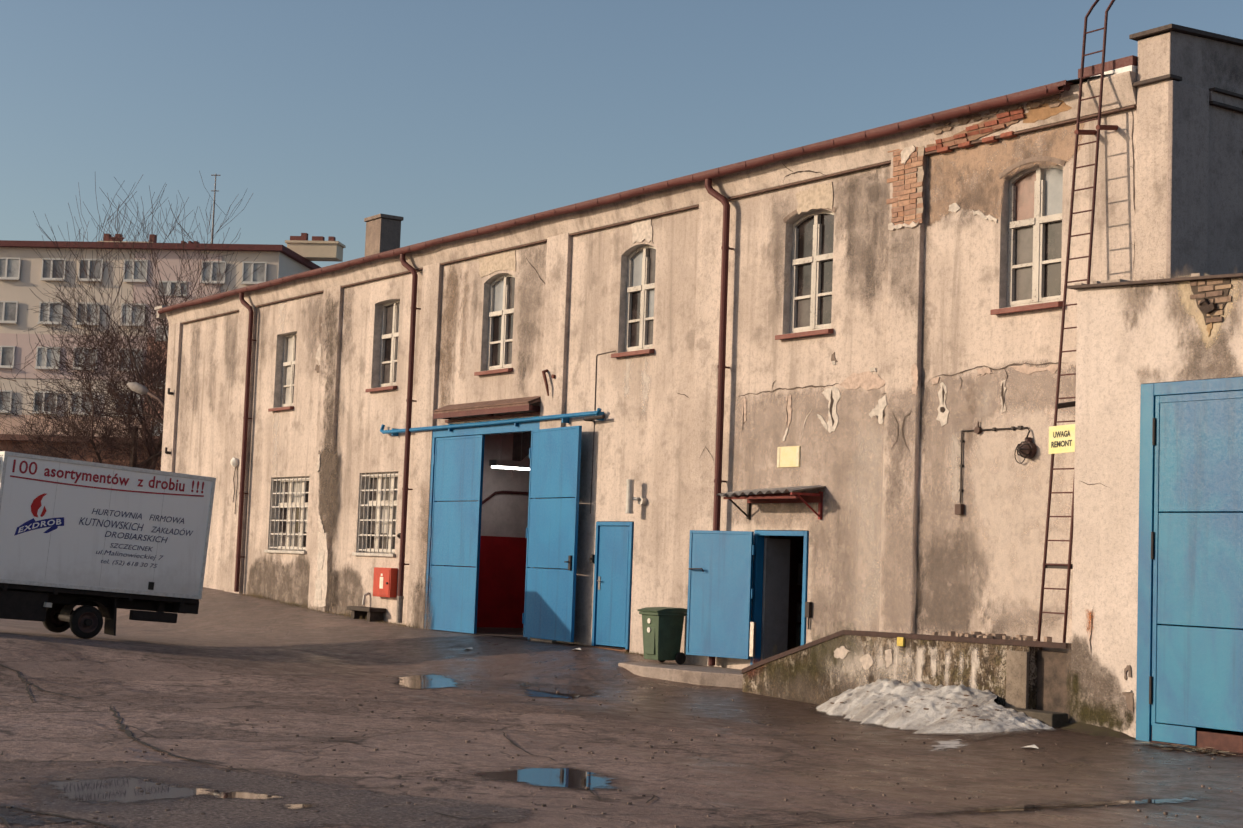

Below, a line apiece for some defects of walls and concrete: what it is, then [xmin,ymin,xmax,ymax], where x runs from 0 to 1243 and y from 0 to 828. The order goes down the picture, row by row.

peeling [886,100,1085,231]
crack [1128,112,1136,211]
spalling [1179,278,1239,347]
damp [324,300,340,480]
spalling [817,367,887,433]
spalling [911,363,950,426]
crack [933,362,1058,390]
spalling [976,364,1058,413]
damp [248,555,310,607]
damp [325,524,365,615]
damp [768,646,979,704]
damp [1067,637,1135,726]